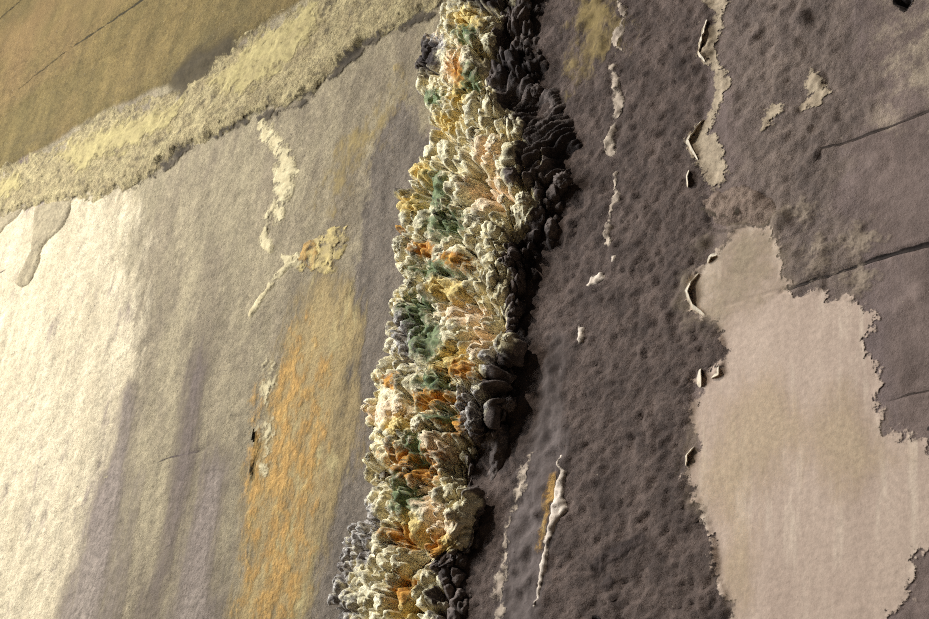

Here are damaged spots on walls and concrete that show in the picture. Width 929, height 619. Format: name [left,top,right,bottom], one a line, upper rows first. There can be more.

corrosion [224,265,366,619]
leakage [327,0,583,619]
peeling [680,0,929,619]
crack [789,242,929,290]
crack [820,109,929,149]